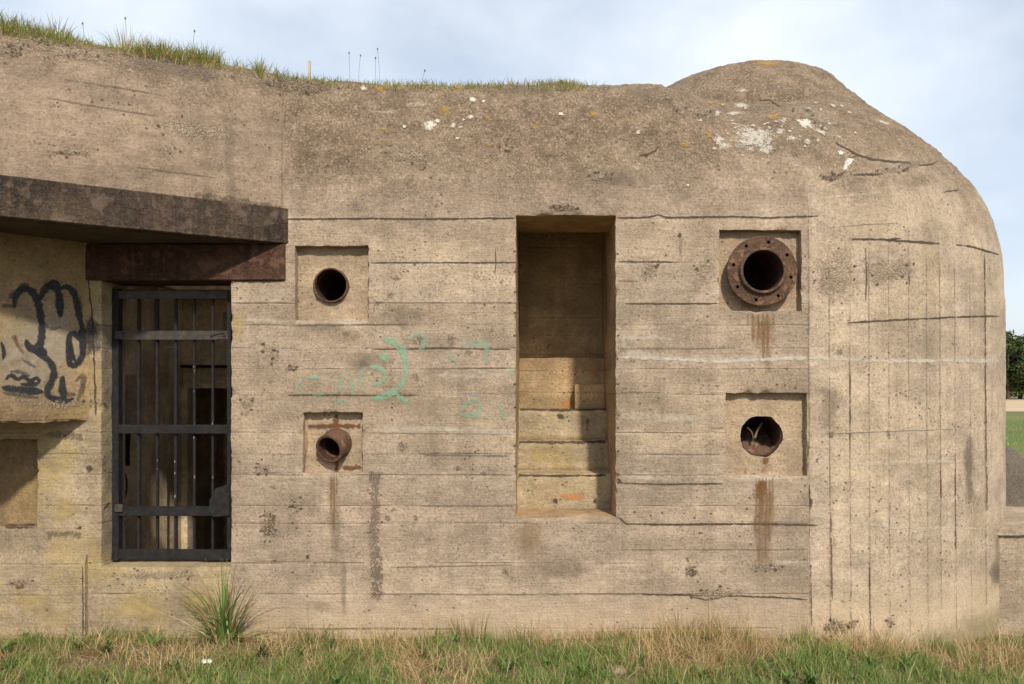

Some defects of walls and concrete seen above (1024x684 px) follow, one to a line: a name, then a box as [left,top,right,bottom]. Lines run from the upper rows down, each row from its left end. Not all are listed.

crack [836,142,937,175]
corrosion [757,481,771,507]
leakage [369,471,397,600]